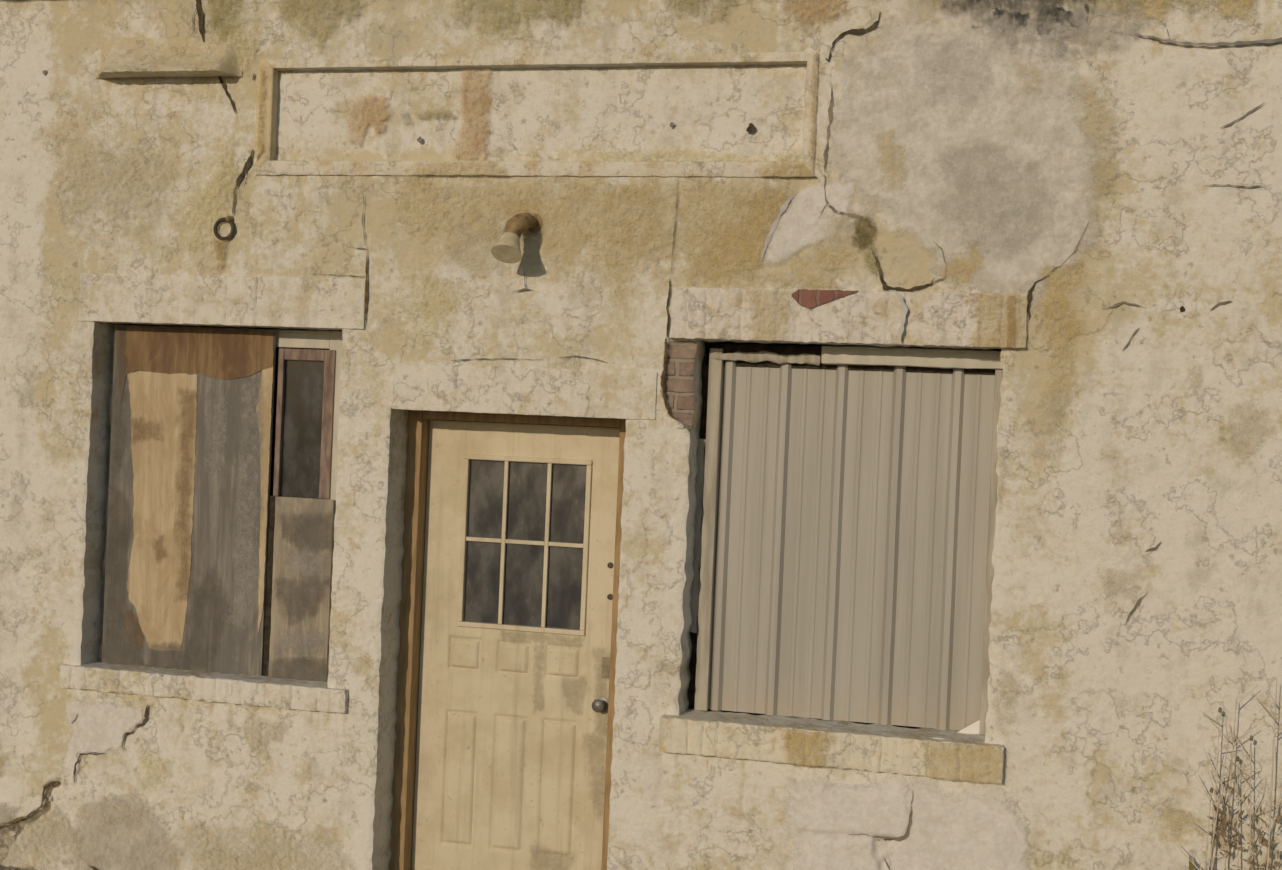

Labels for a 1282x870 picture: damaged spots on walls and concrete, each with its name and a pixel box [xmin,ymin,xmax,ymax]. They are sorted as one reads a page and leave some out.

crack [192,0,205,43]
crack [219,73,255,113]
crack [232,150,253,213]
crack [819,12,947,340]
spalling [791,289,857,309]
crack [1027,222,1089,321]
spalling [659,338,995,439]
spalling [687,632,698,709]
crack [71,705,148,783]
spalling [0,781,61,865]
crack [848,797,913,841]